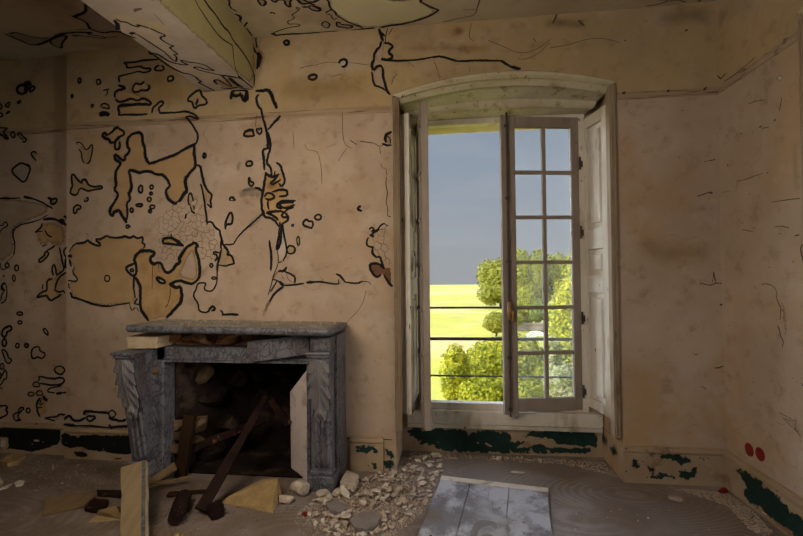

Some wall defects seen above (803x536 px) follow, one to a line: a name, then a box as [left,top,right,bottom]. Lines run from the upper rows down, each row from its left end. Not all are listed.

flaking render [257,0,439,95]
crack [300,0,626,85]
flaking render [0,0,252,321]
crack [152,164,287,316]
flaking render [366,223,393,287]
flaking render [0,311,46,389]
peeling [0,365,131,467]
peeling [356,439,394,471]
peeling [408,427,620,455]
peeling [625,454,709,480]
peeling [736,468,803,536]